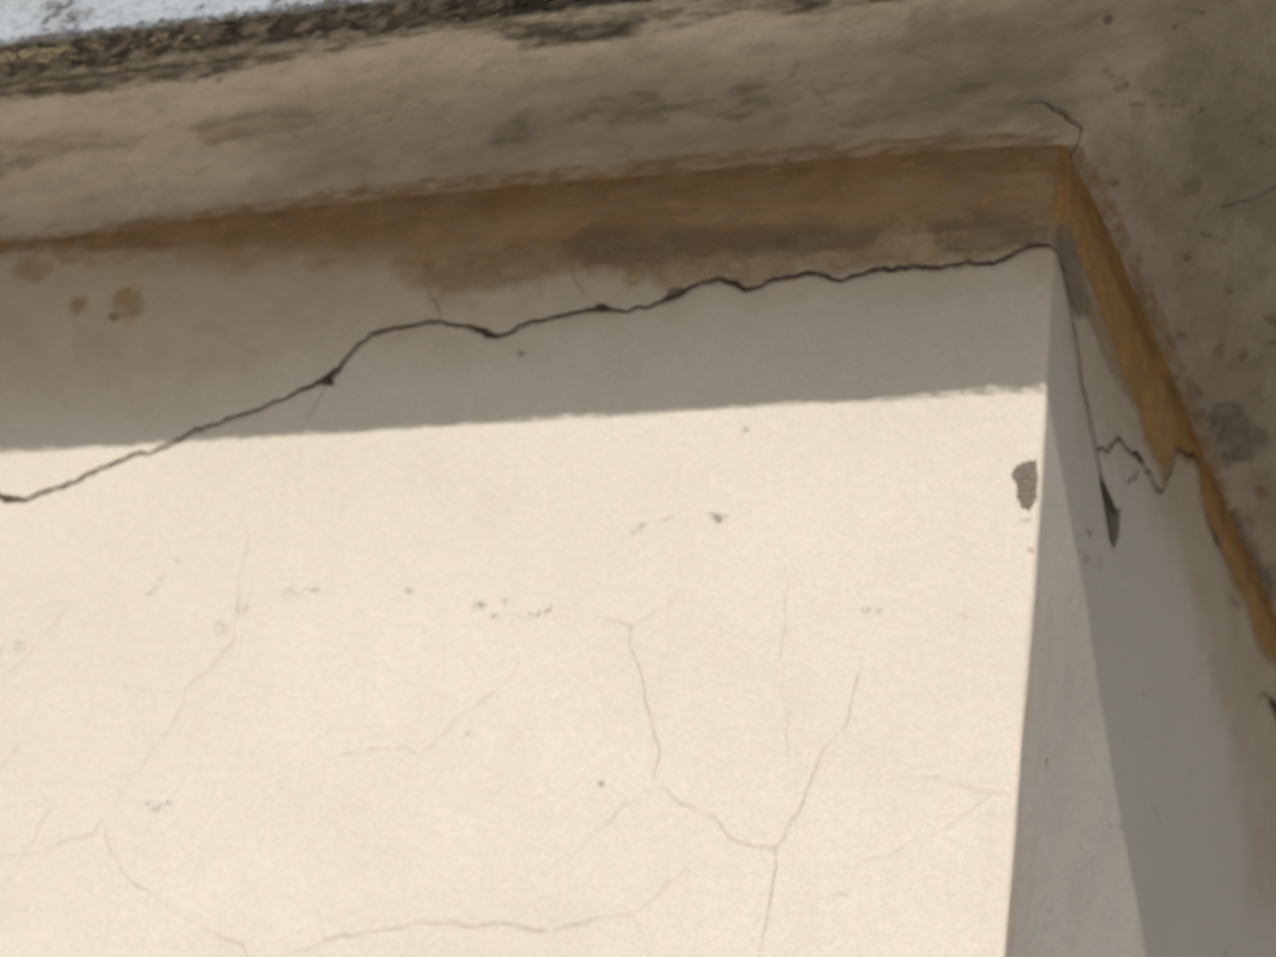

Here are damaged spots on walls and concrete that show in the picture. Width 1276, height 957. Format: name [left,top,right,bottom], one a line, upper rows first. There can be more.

leakage [0,0,651,97]
crack [0,243,1201,547]
leakage [87,144,1276,661]
peeling [1011,460,1039,511]